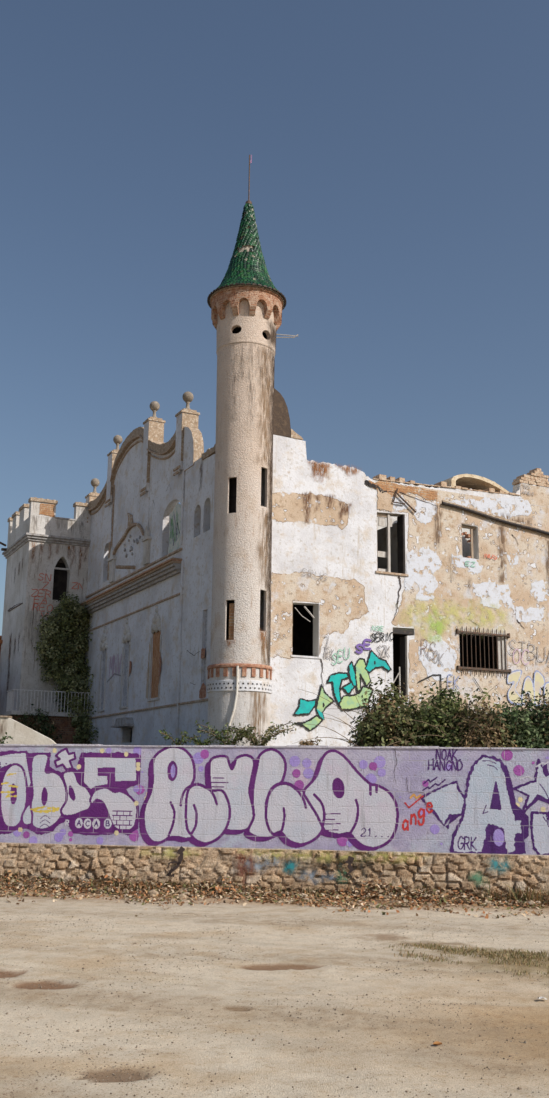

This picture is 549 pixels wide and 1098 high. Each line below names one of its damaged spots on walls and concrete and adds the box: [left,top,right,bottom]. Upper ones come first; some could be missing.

peeling [272,492,349,530]
peeling [270,572,369,659]
peeling [365,480,549,714]